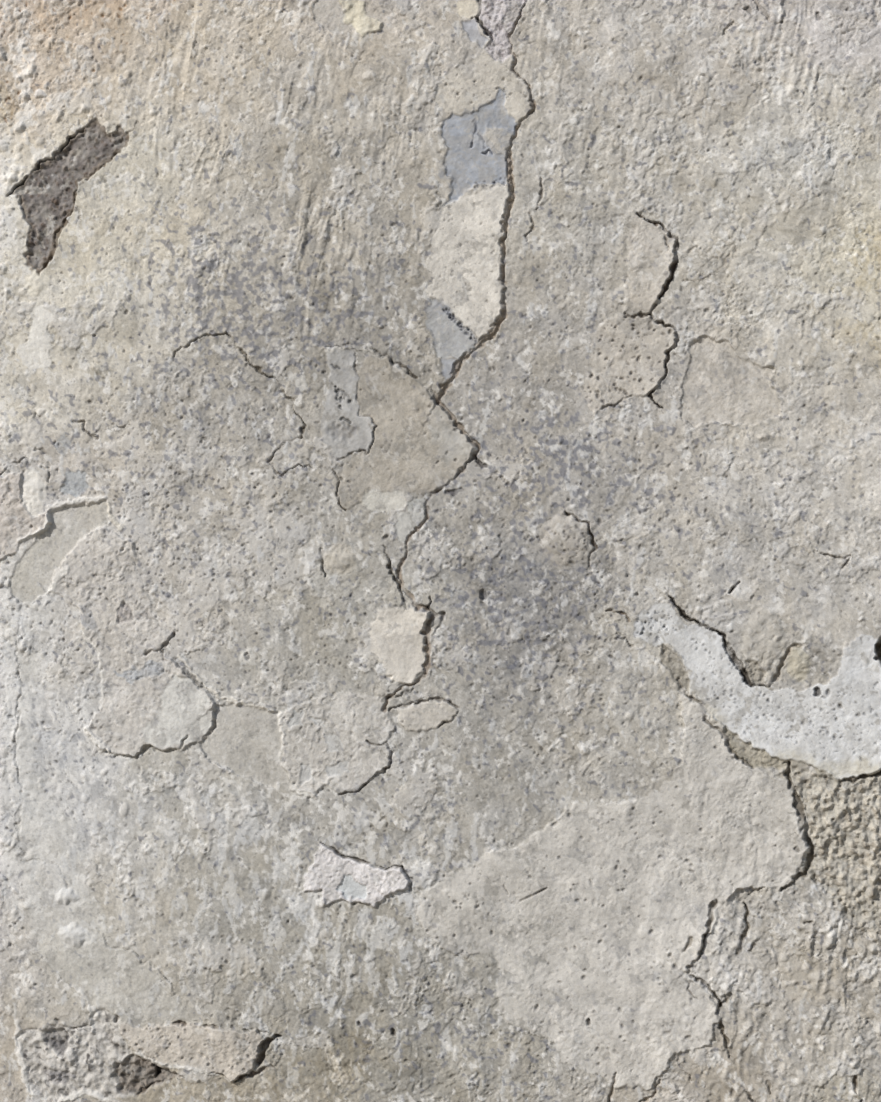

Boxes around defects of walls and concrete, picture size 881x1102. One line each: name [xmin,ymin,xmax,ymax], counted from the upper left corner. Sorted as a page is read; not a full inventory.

crack [724,0,784,33]
spalling [6,118,139,277]
flaking render [425,0,531,381]
crack [173,333,348,511]
crack [326,0,544,715]
crack [600,213,732,410]
crack [677,677,755,770]
flaking render [14,647,266,1102]
flaking render [304,604,881,1091]
crack [736,761,816,956]
crack [682,899,732,1055]
crack [746,1080,772,1102]